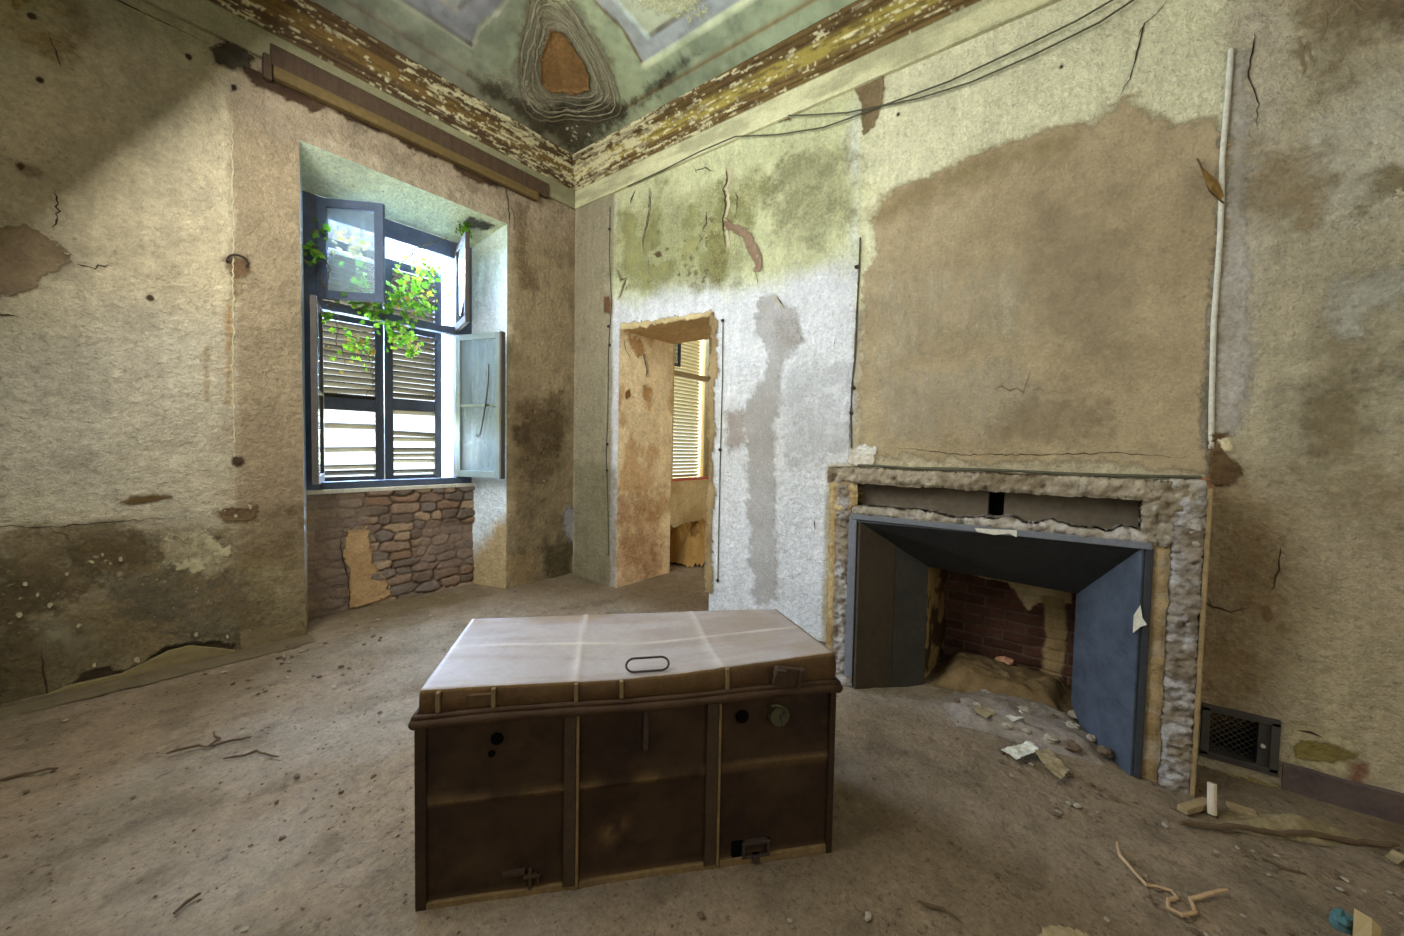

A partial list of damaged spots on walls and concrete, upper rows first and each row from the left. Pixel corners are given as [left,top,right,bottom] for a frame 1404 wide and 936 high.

spalling [210,41,500,186]
leakage [480,0,689,153]
peeling [855,76,886,135]
crack [1247,32,1260,128]
spalling [0,192,107,296]
peeling [846,95,1242,487]
leakage [1249,149,1339,230]
peeling [744,295,802,604]
leakage [0,511,309,703]